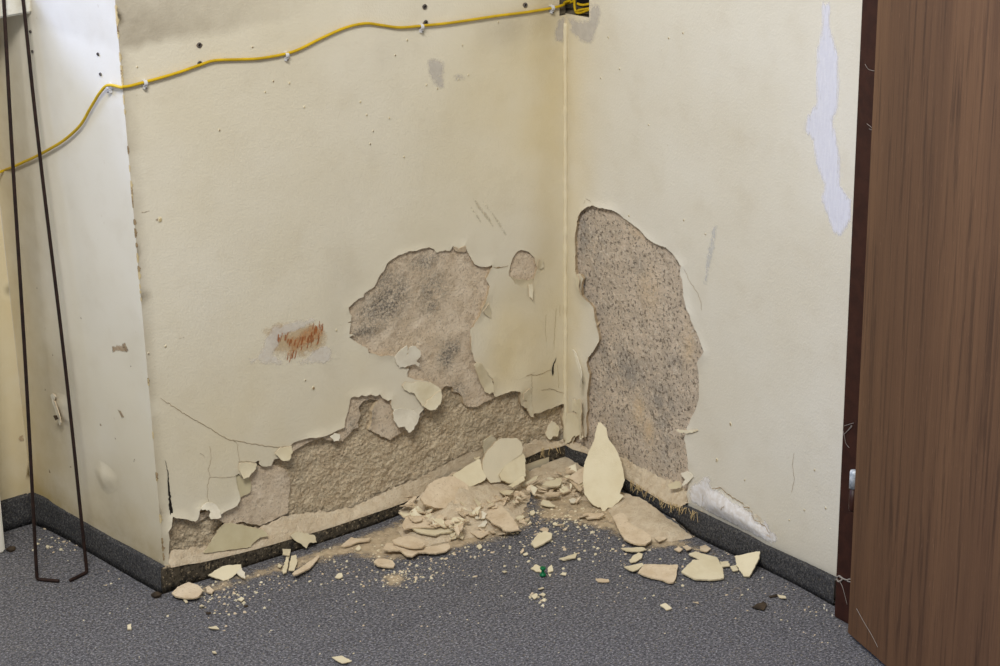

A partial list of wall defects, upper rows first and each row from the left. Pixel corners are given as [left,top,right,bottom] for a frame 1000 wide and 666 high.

spalling [127,146,142,301]
corrosion [274,321,323,362]
spalling [159,205,776,561]
crack [162,399,285,501]
crack [165,461,173,515]
peeling [282,531,316,575]
peeling [374,543,450,568]